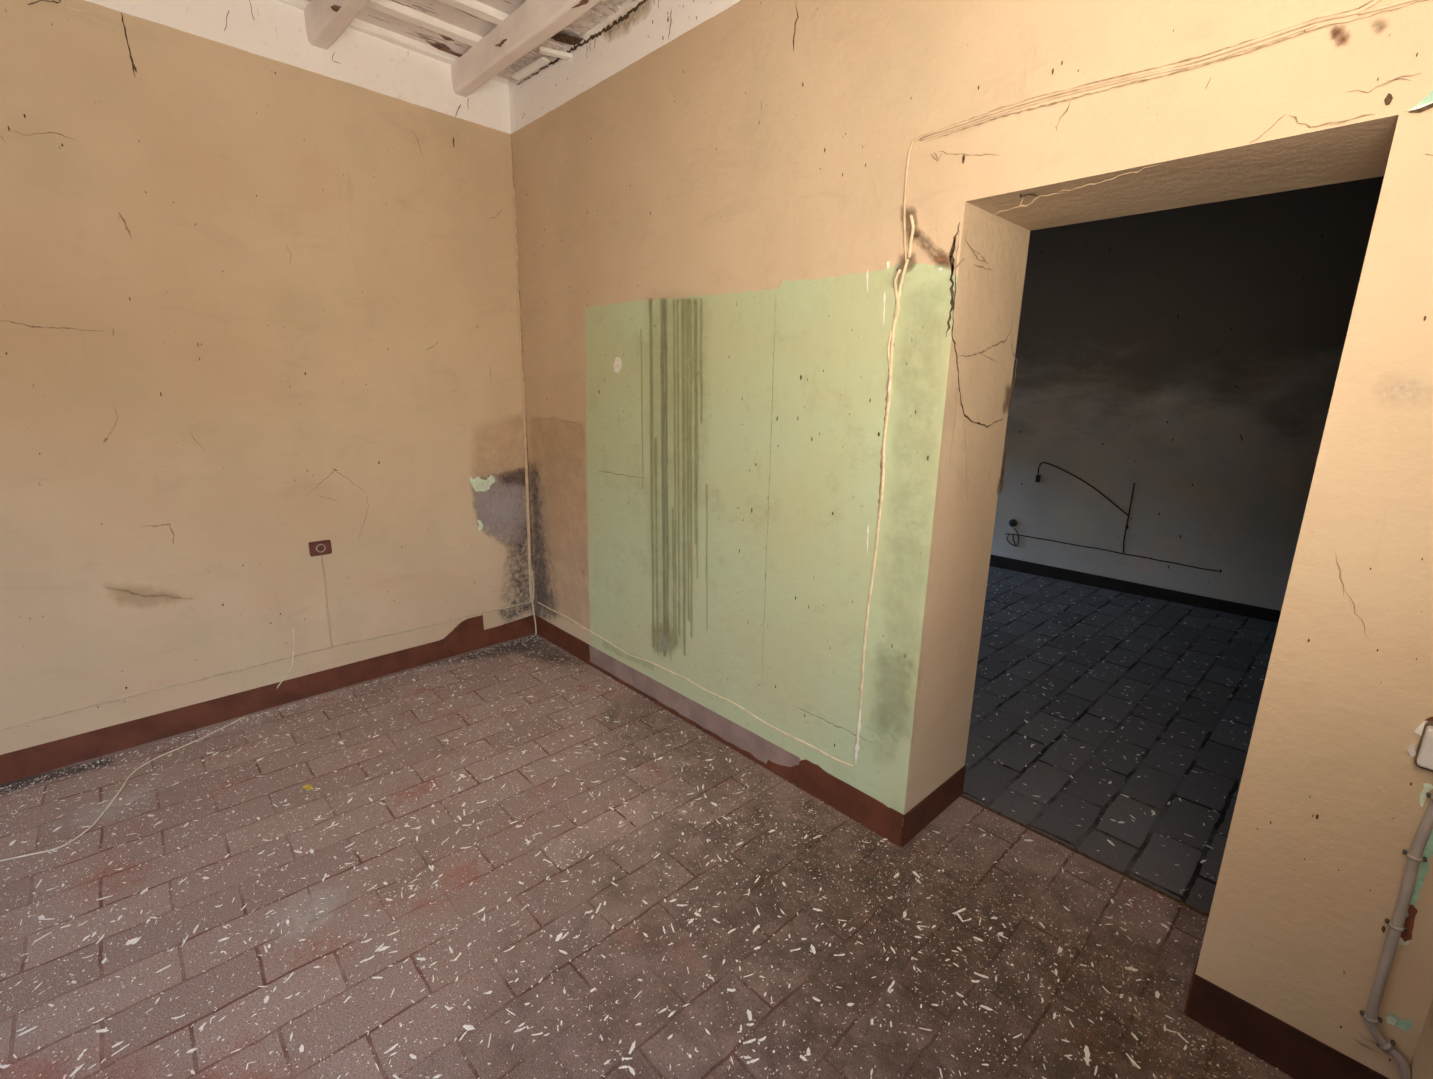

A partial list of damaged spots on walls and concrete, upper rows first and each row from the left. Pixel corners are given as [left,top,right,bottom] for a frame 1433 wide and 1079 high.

spalling [496,0,637,83]
crack [914,164,1159,493]
peeling [0,638,746,968]
peeling [53,997,178,1079]
peeling [410,989,475,1046]
peeling [588,970,644,1077]
peeling [656,1003,752,1035]
peeling [685,906,736,988]
peeling [744,829,887,954]
peeling [877,858,1014,973]
peeling [1028,882,1143,1060]
peeling [1120,967,1174,1040]